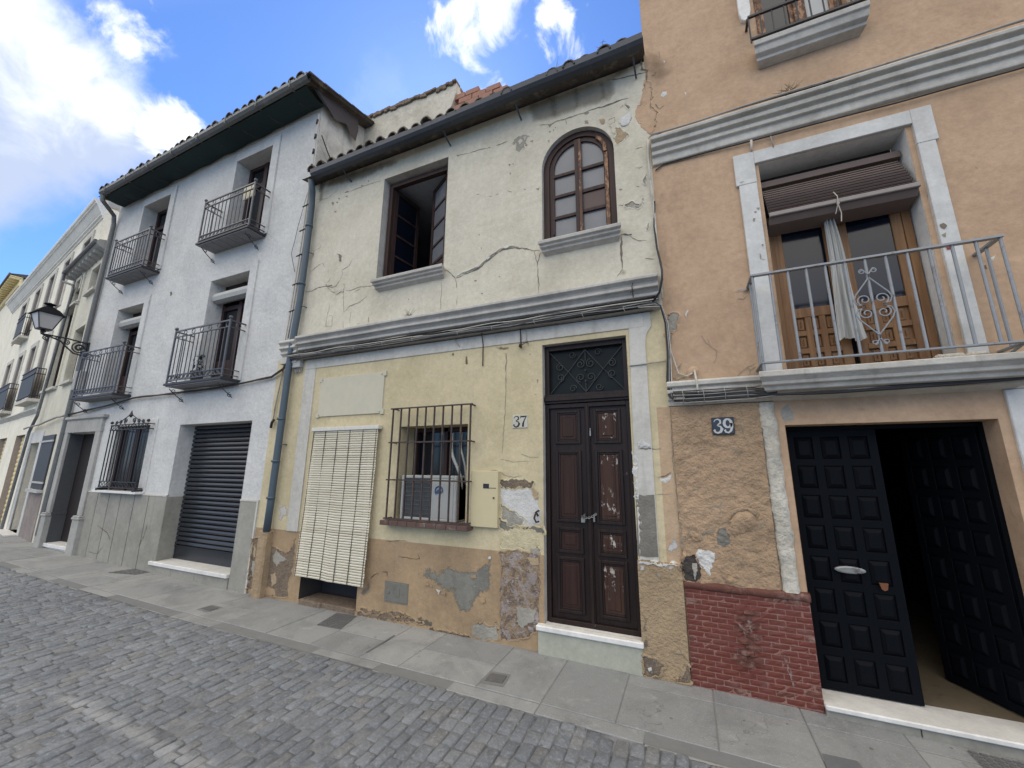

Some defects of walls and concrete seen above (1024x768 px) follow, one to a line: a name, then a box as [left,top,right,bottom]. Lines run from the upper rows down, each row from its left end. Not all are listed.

peeling [599,80,667,146]
crack [308,248,369,322]
crack [441,244,540,292]
peeling [631,439,658,557]
peeling [265,538,297,599]
peeling [418,548,543,643]
flaking render [677,549,715,583]